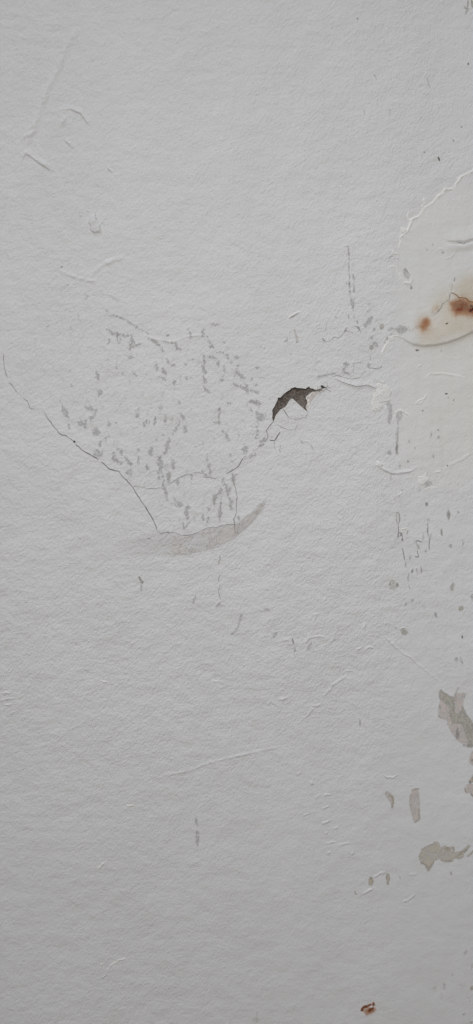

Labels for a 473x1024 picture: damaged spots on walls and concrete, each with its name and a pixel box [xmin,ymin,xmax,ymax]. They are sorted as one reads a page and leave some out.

corrosion [421,279,473,329]
flaking render [106,315,382,458]
crack [3,355,298,536]
peeling [439,686,473,763]
peeling [419,842,472,869]